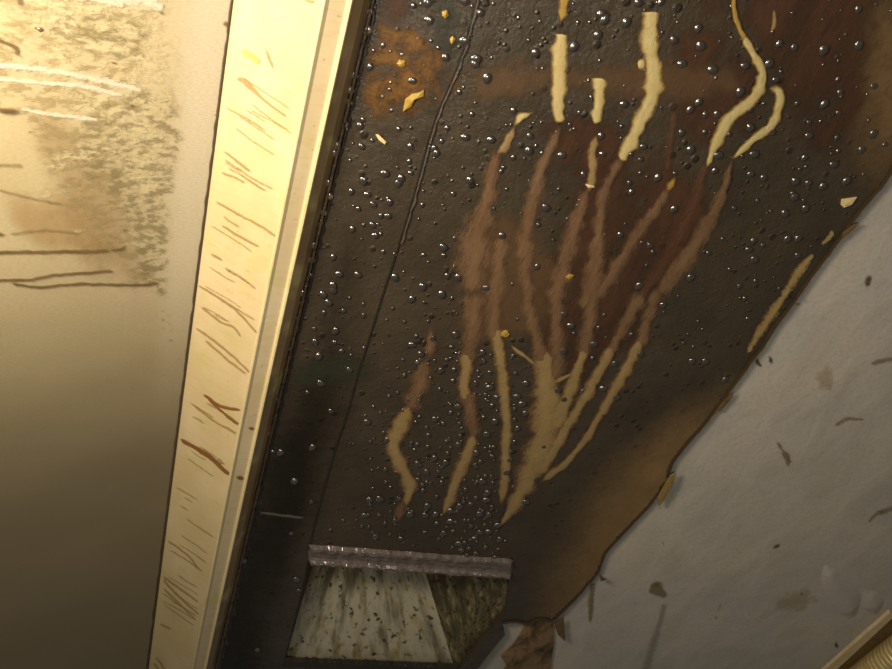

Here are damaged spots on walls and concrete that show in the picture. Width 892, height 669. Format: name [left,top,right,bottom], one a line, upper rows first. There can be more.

crack [0,40,18,55]
leakage [0,63,141,96]
rust [681,31,722,75]
rust [749,0,892,162]
crack [0,190,59,204]
crack [0,229,158,289]
leakage [443,0,784,525]
rust [479,62,752,369]
peeling [822,223,859,244]
peeling [841,197,857,208]
peeling [747,255,813,352]
leakage [386,332,435,519]